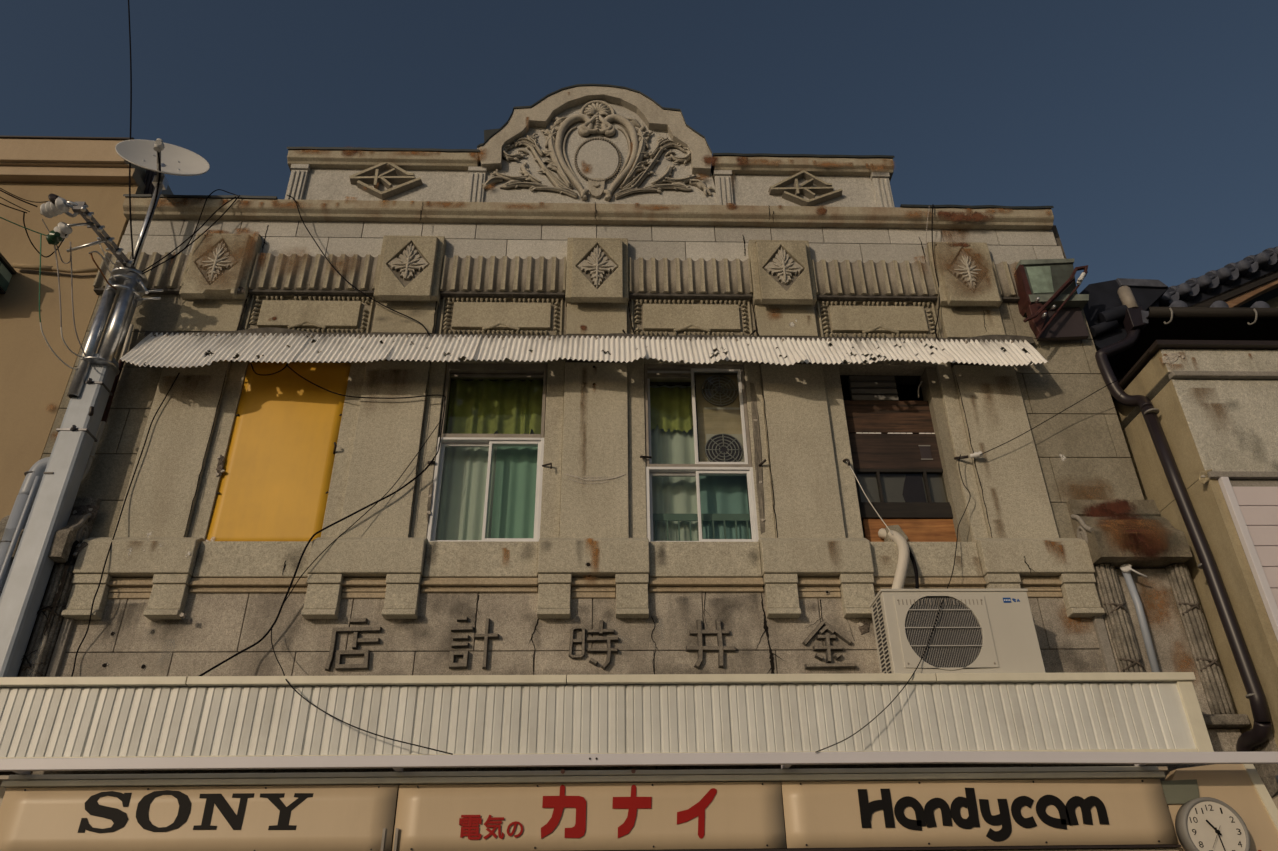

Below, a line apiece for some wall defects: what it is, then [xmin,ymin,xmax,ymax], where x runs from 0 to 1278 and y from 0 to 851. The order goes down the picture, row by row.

rust [908,208,1009,265]
rust [1071,484,1167,556]
crack [651,616,659,674]
crack [756,593,784,674]